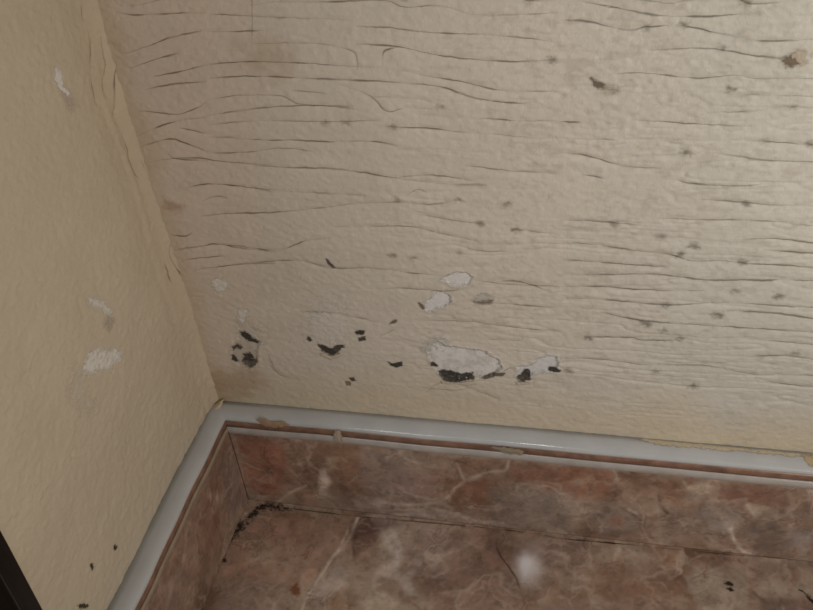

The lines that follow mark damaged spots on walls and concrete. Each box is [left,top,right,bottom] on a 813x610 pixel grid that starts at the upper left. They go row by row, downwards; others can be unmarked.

crack [156,110,236,163]
crack [752,238,812,281]
spalling [231,308,262,368]
peeling [307,337,345,360]
peeling [418,272,473,311]
peeling [422,338,561,390]
crack [591,286,667,341]
crack [767,305,813,356]